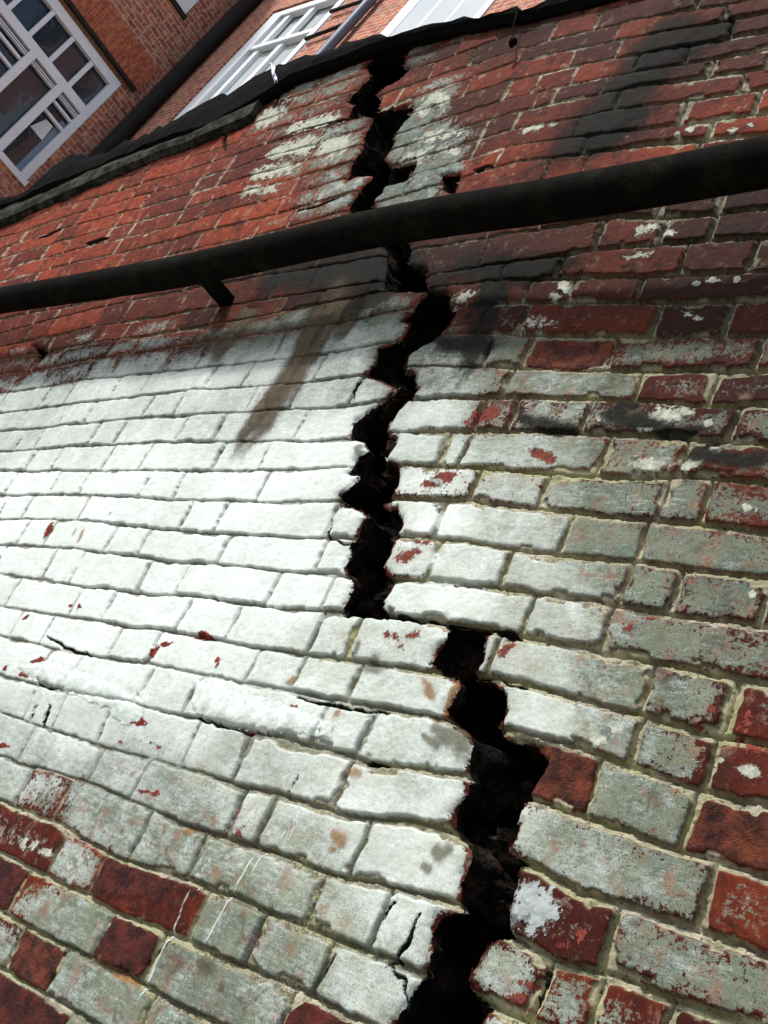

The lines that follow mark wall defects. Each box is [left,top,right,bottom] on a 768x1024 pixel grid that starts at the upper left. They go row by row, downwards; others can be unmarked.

leakage [543,12,738,176]
crack [280,54,417,214]
crack [475,165,494,174]
crack [328,243,549,1024]
crack [297,697,390,715]
spalling [532,745,597,812]
spalling [686,801,768,870]
spalling [0,858,28,910]
spalling [91,858,201,974]
spalling [0,930,68,1024]
spalling [285,1003,351,1024]
crack [537,970,554,1012]